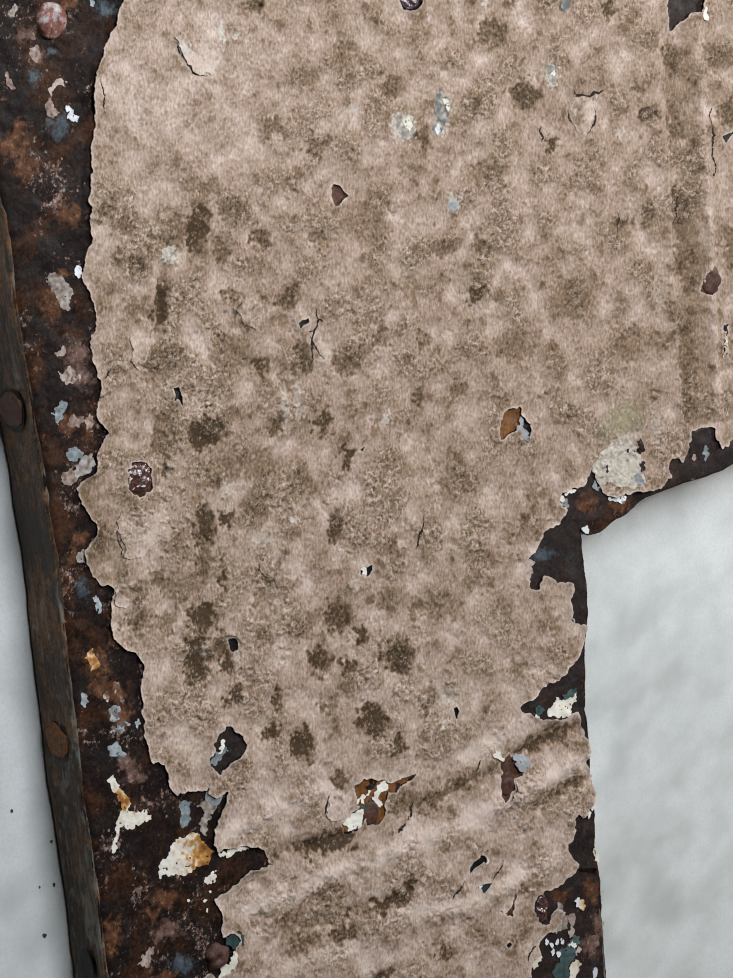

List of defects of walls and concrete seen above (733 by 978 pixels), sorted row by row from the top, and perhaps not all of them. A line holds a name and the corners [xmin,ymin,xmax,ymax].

crack [568,90,603,133]
rust [0,117,39,183]
rust [64,336,95,393]
peeling [0,0,272,978]
peeling [663,427,733,488]
peeling [527,438,646,625]
rust [84,638,135,733]
peeling [520,648,587,738]
rust [117,754,146,783]
peeling [326,774,416,834]
rust [145,890,180,945]
peeling [531,804,604,978]